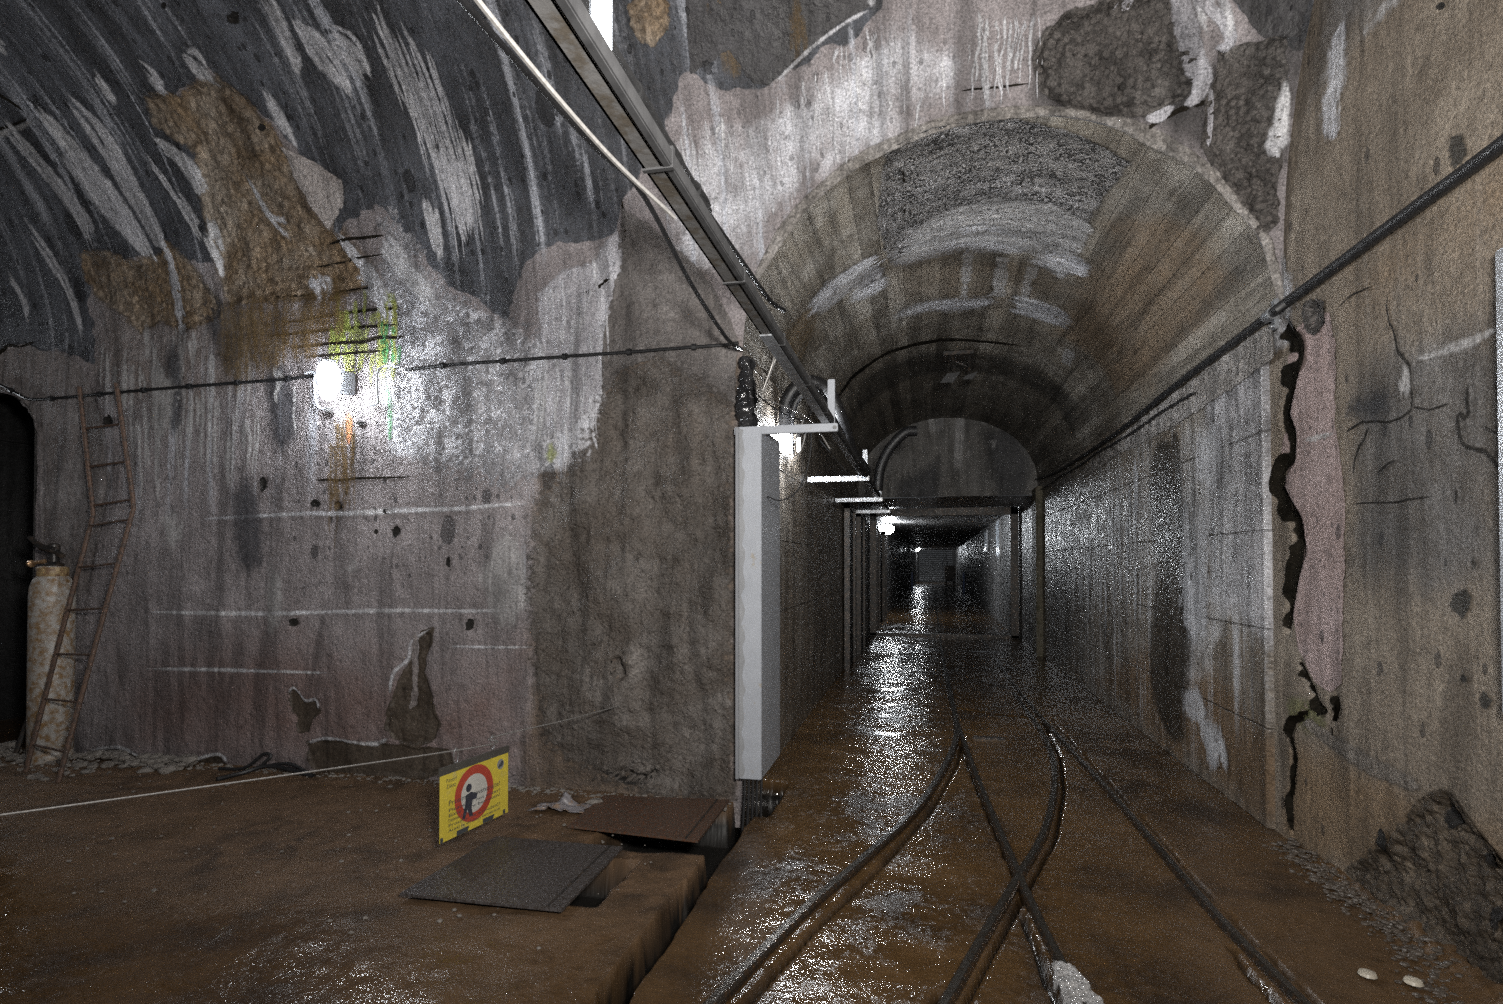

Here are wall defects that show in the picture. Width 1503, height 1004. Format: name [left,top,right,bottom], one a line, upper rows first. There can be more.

spalling [227,11,239,24]
spalling [78,75,370,335]
crack [1340,286,1499,504]
crack [1269,323,1341,830]
peeling [288,627,454,779]
spalling [1345,789,1503,984]